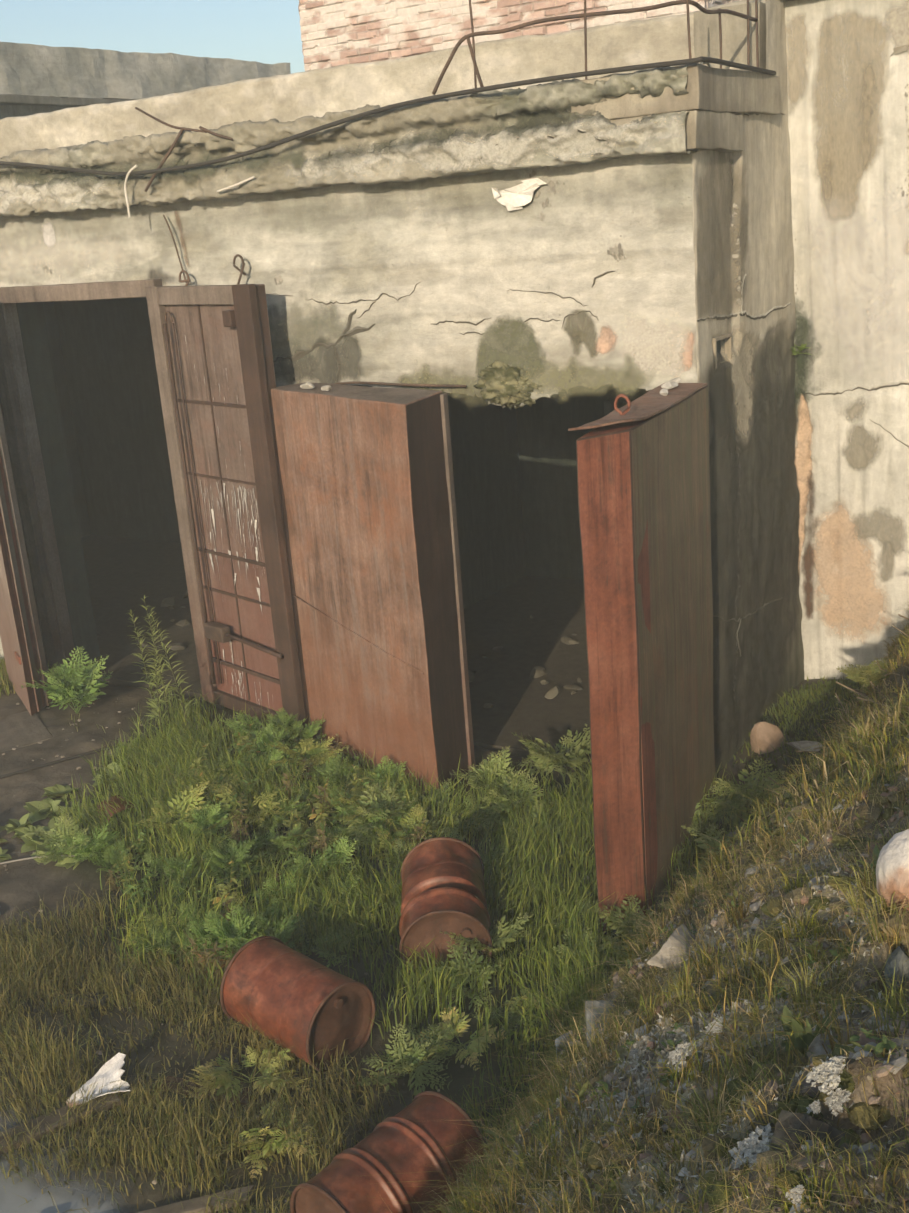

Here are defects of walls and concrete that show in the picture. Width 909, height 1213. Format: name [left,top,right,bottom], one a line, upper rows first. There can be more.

water stain [786,13,886,218]
flaking render [491,178,547,211]
water stain [698,152,747,314]
water stain [268,309,360,385]
crack [266,282,420,383]
crack [430,318,490,335]
crack [508,270,615,330]
water stain [565,310,597,365]
crack [806,381,909,447]
water stain [844,403,879,469]
water stain [709,329,800,760]
water stain [852,511,903,580]